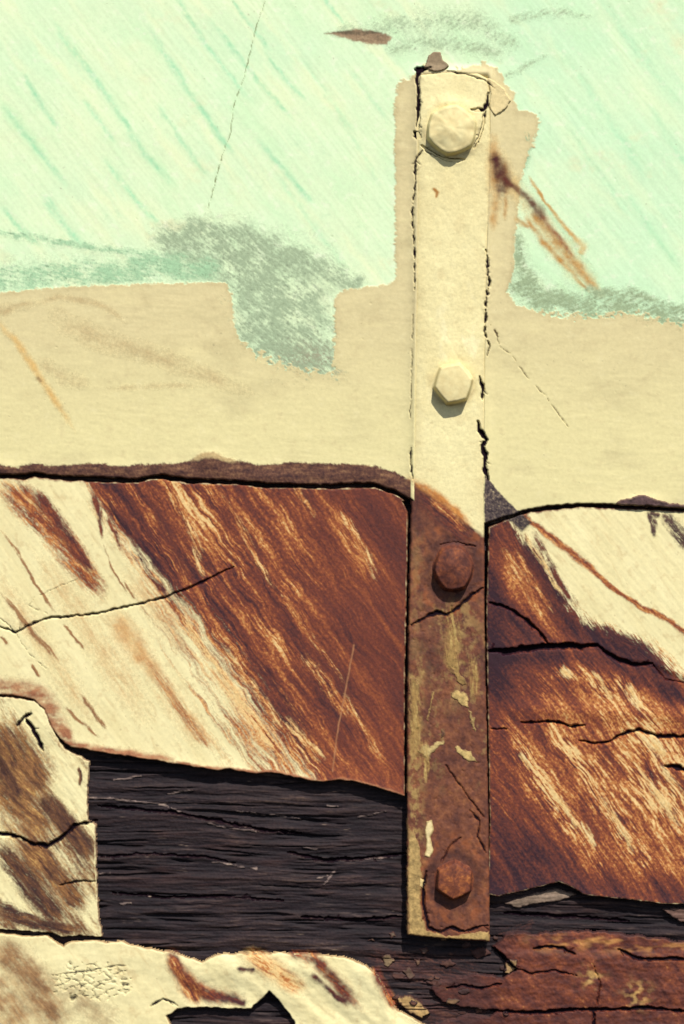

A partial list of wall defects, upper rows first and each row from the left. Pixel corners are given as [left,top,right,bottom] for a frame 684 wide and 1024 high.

crack [409,66,495,419]
rust [483,132,602,291]
peeling [0,208,368,391]
crack [0,561,235,669]
rust [0,450,684,904]
crack [410,587,684,683]
crack [490,719,684,772]
crack [0,764,684,1024]
peeling [392,994,430,1018]
peeling [500,959,518,974]
peeling [504,888,576,908]
peeling [662,907,684,922]